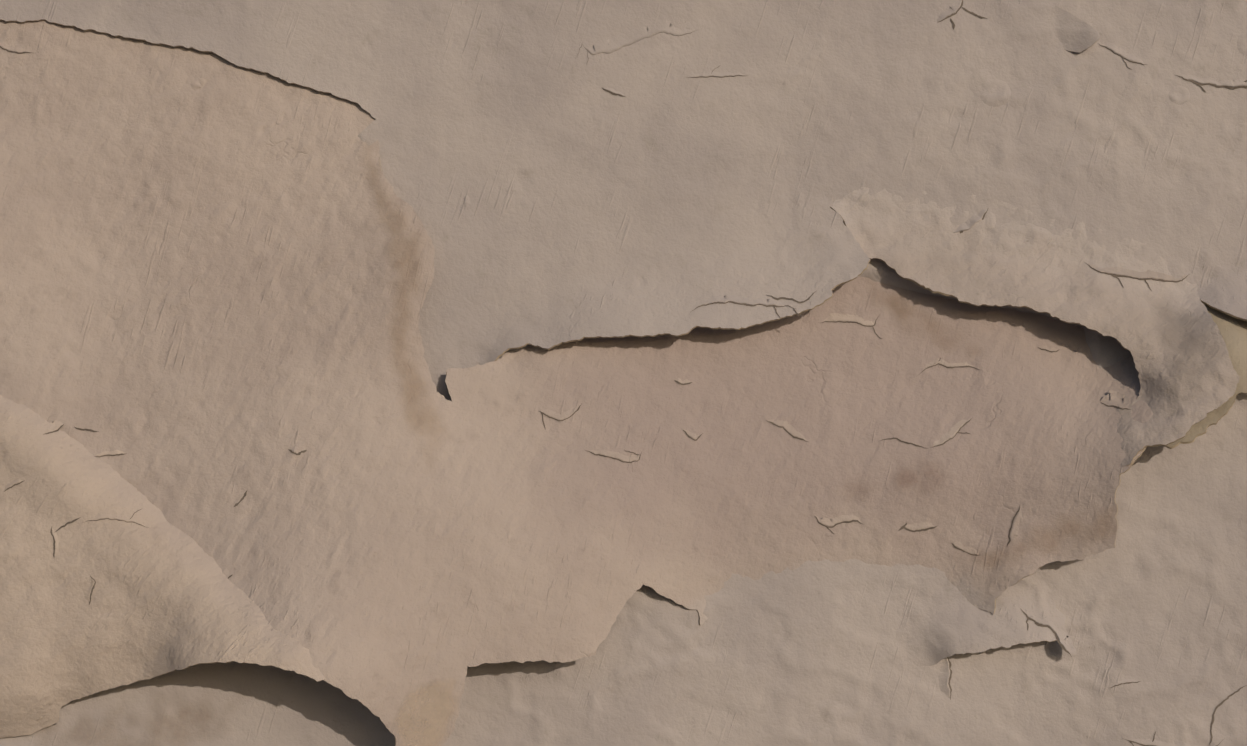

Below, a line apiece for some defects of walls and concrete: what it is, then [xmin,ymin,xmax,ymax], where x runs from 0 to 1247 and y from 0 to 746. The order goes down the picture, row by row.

crack [577,20,700,62]
crack [937,0,987,30]
peeling [1050,5,1101,53]
crack [1100,43,1146,69]
crack [603,87,626,97]
crack [1179,75,1247,92]
peeling [476,189,870,365]
peeling [830,187,1247,466]
peeling [0,395,326,738]
peeling [888,579,1066,666]
crack [1122,685,1247,746]